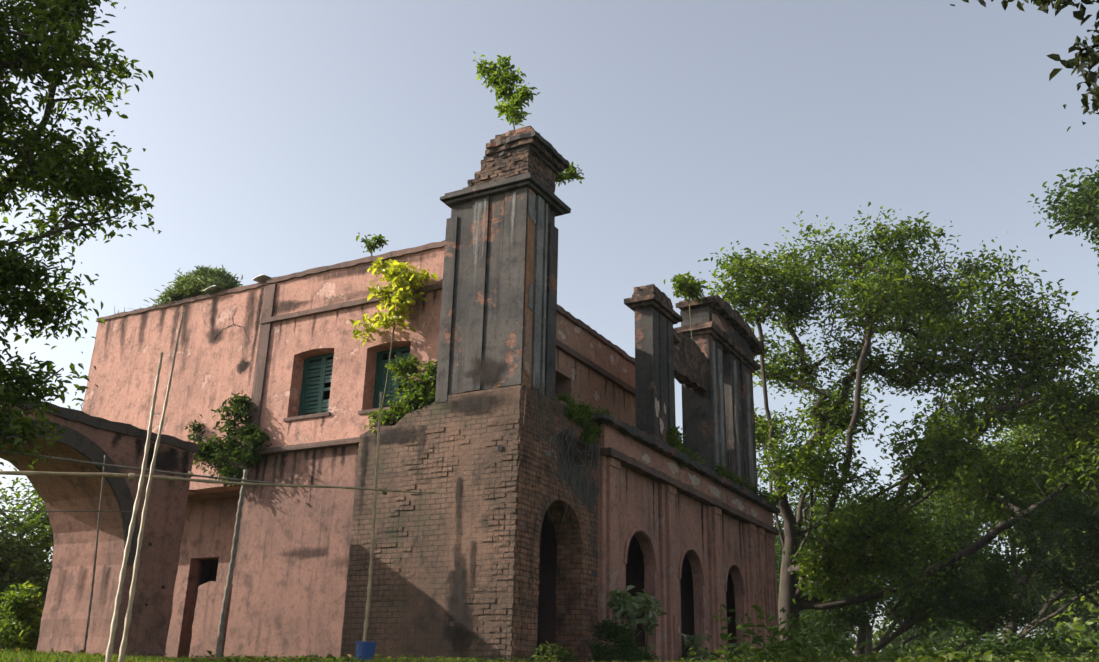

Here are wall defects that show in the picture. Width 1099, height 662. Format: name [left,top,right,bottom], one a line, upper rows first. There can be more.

water stain [474,201,486,259]
water stain [160,304,189,342]
water stain [207,297,221,343]
water stain [245,288,264,371]
water stain [254,436,367,513]
water stain [284,548,325,558]
water stain [445,477,475,654]